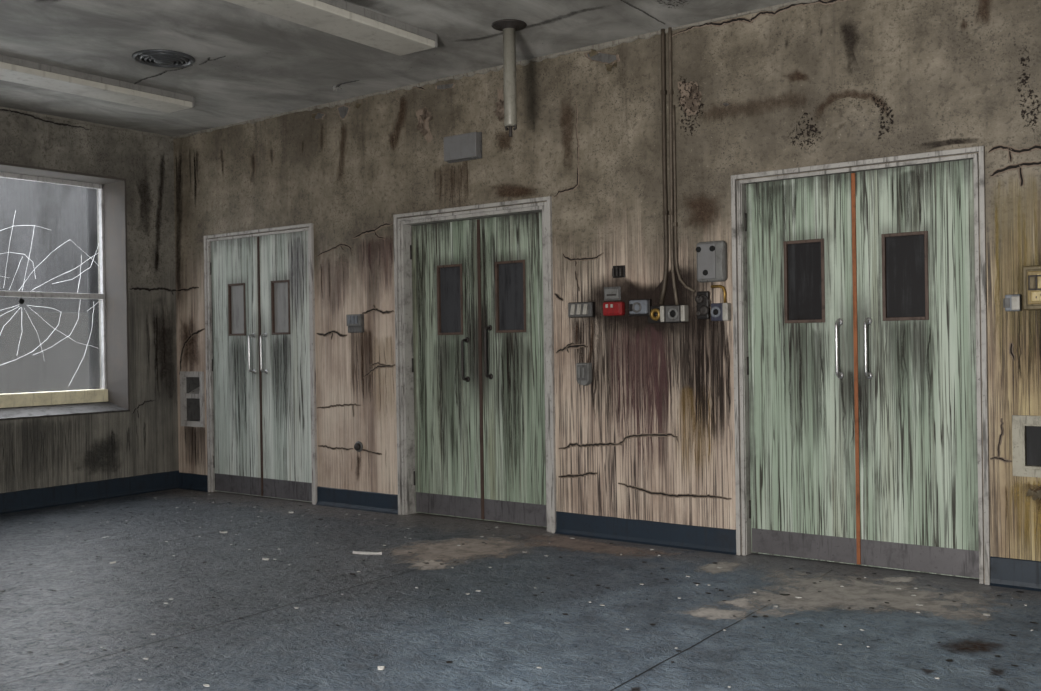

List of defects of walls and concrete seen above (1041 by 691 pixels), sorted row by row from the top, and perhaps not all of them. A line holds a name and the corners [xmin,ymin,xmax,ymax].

crack [0,211,99,385]